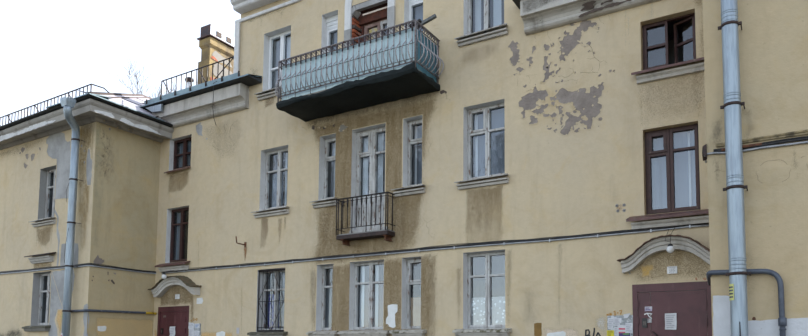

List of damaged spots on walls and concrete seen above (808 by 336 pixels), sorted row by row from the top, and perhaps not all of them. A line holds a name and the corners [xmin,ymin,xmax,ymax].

peeling [0,120,56,141]
flaking render [19,132,79,336]
flaking render [81,145,93,186]
water stain [309,91,438,336]
water stain [465,185,504,243]
peeling [506,0,631,137]